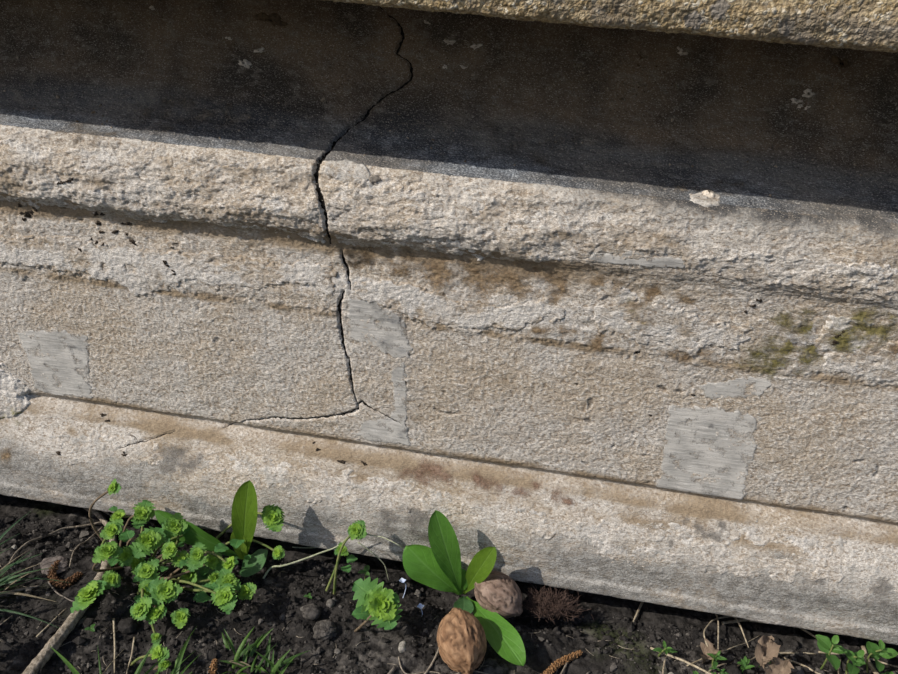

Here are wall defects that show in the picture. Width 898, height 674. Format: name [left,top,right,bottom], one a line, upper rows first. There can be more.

crack [223,6,413,428]
leakage [686,518,726,541]